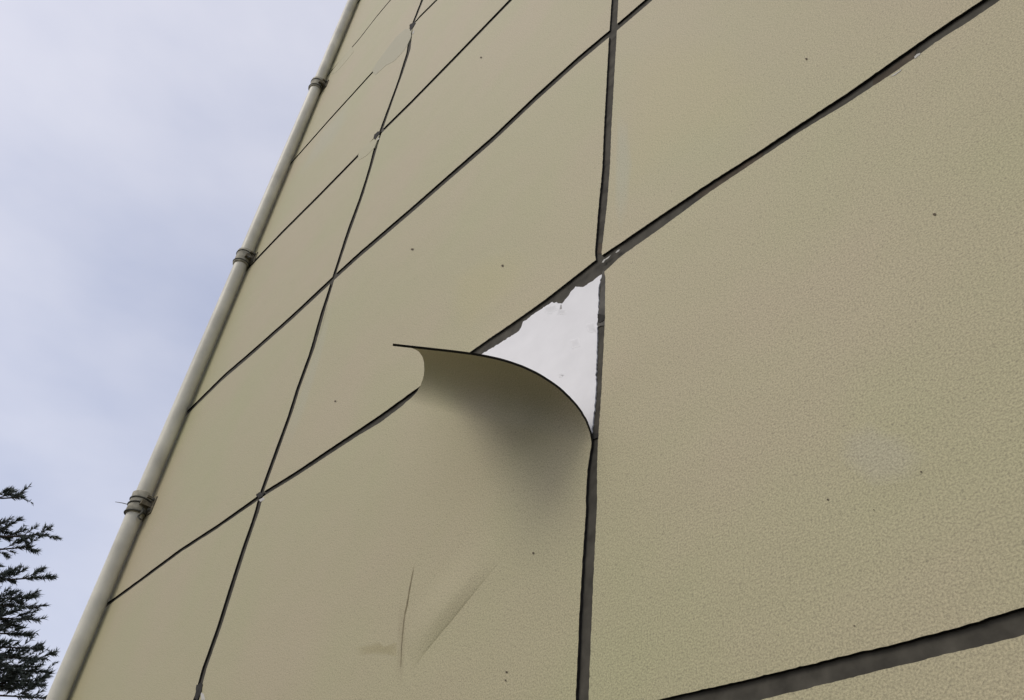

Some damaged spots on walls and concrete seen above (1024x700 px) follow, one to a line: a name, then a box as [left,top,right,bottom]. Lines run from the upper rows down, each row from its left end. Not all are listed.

peeling [393,344,593,448]
crack [400,571,413,667]